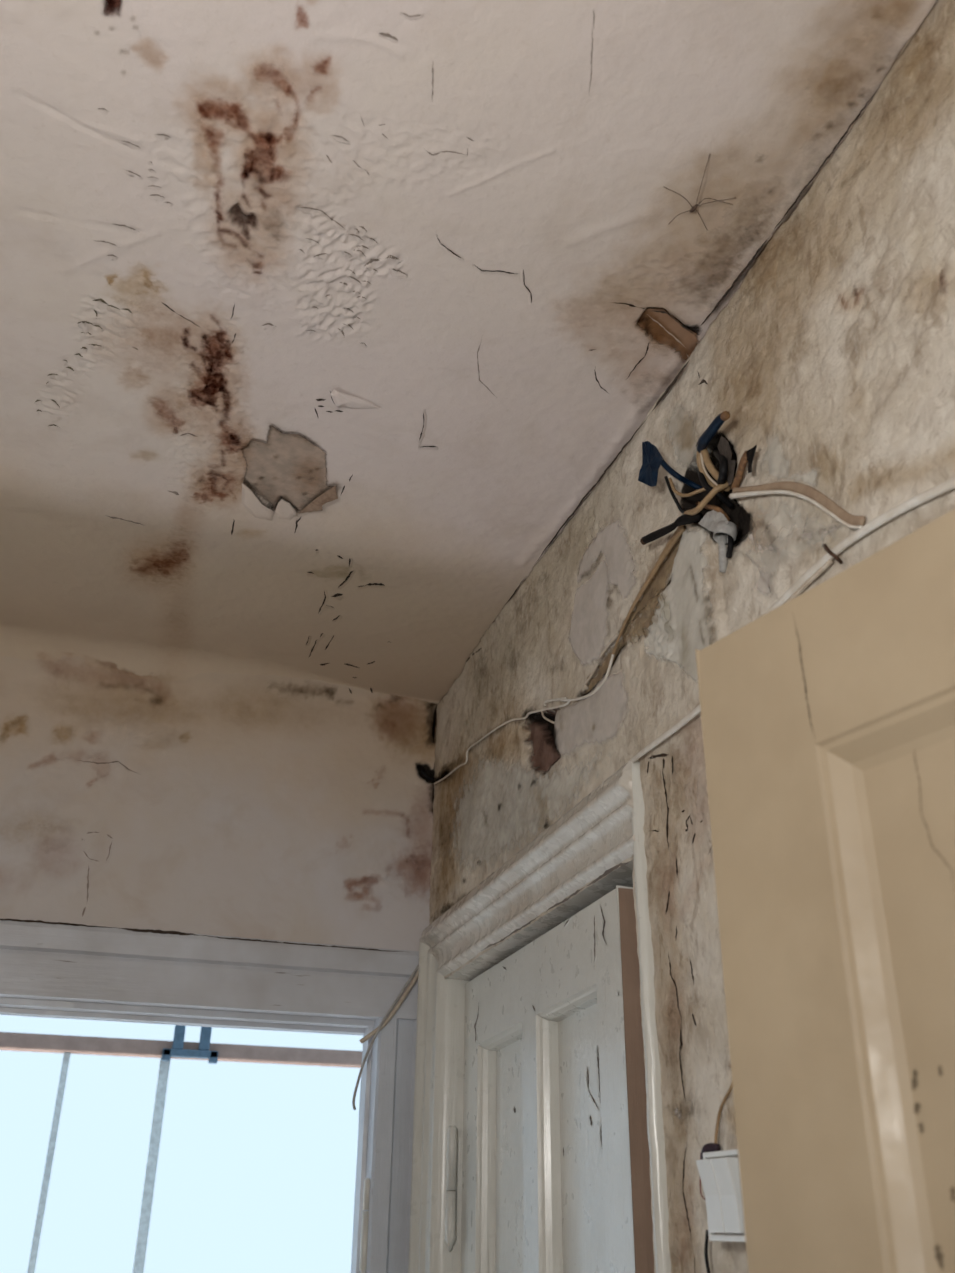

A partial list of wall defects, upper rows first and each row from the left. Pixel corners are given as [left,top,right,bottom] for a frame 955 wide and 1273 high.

crack [701,0,937,325]
spalling [633,304,699,360]
peeling [242,426,338,521]
crack [466,360,707,662]
crack [295,517,385,694]
spalling [524,709,561,774]
crack [647,753,712,1101]
crack [682,1145,695,1271]